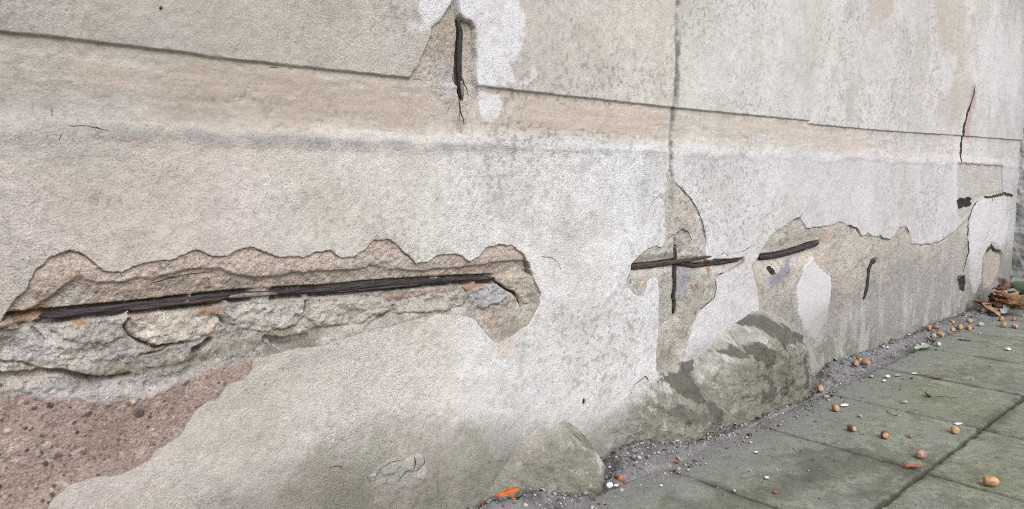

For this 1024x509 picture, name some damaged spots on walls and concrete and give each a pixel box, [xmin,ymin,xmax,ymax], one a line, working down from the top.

peeling [45,6,477,137]
crack [960,85,976,161]
peeling [627,164,1001,371]
spalling [0,239,540,509]